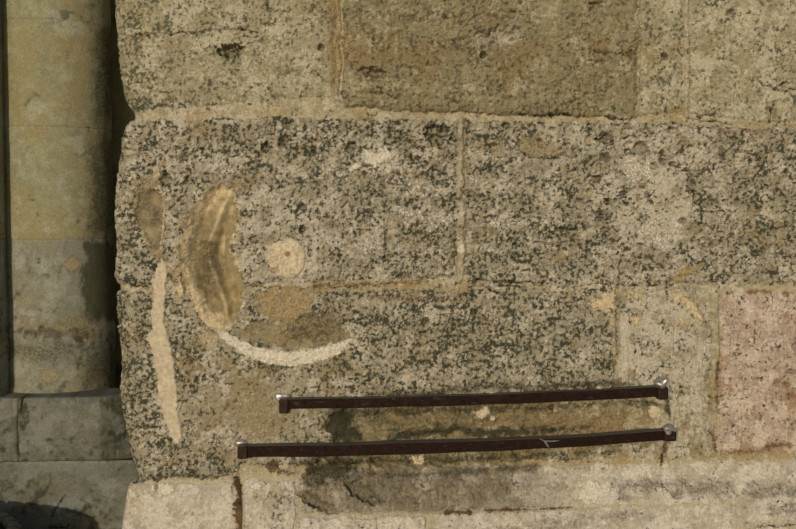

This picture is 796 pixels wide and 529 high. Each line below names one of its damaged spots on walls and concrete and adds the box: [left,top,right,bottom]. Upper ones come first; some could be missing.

crack [135,26,257,38]
crack [761,81,795,123]
corrosion [232,476,243,529]